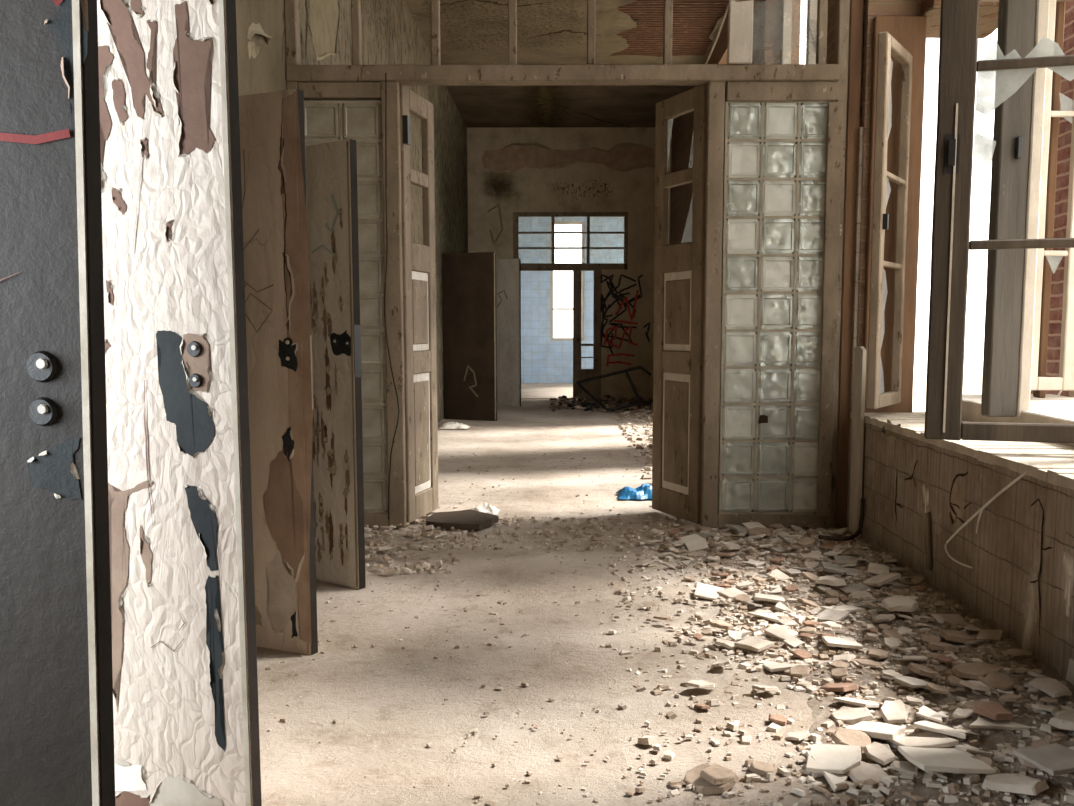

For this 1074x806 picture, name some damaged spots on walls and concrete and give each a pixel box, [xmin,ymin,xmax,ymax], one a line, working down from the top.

flaking render [482,142,655,203]
crack [895,460,918,531]
crack [949,472,972,523]
crack [1029,498,1074,635]